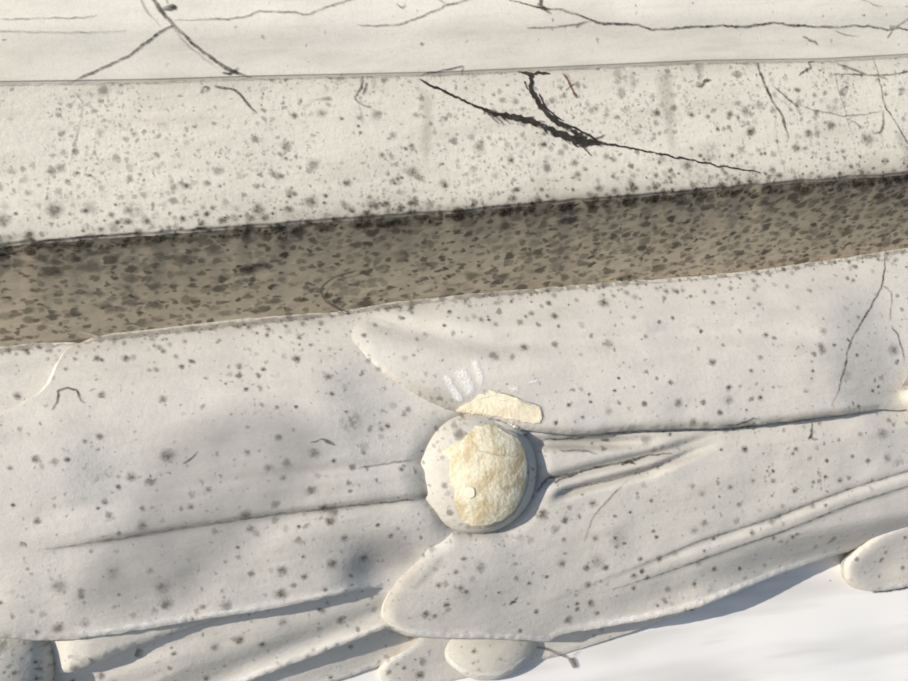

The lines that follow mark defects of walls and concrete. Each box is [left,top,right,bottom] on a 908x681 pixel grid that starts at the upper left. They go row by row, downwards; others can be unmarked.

crack [81,0,252,109]
crack [520,0,907,74]
crack [420,66,761,173]
crack [757,67,798,128]
crack [852,69,908,142]
mould [99,204,342,249]
mould [452,170,706,221]
crack [840,269,885,380]
peeling [442,389,542,526]